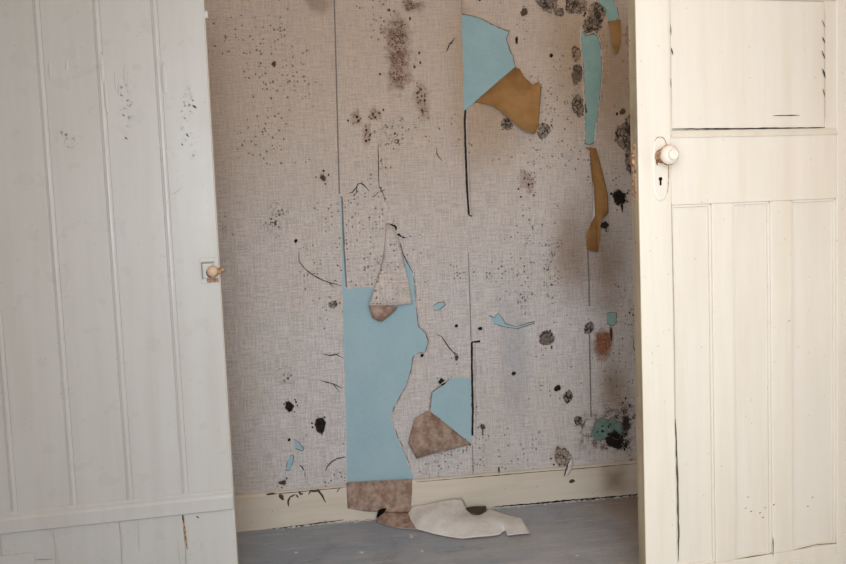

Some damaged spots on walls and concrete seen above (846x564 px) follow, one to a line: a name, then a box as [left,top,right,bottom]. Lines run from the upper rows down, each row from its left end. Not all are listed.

mould [379,0,421,88]
leakage [582,397,636,451]